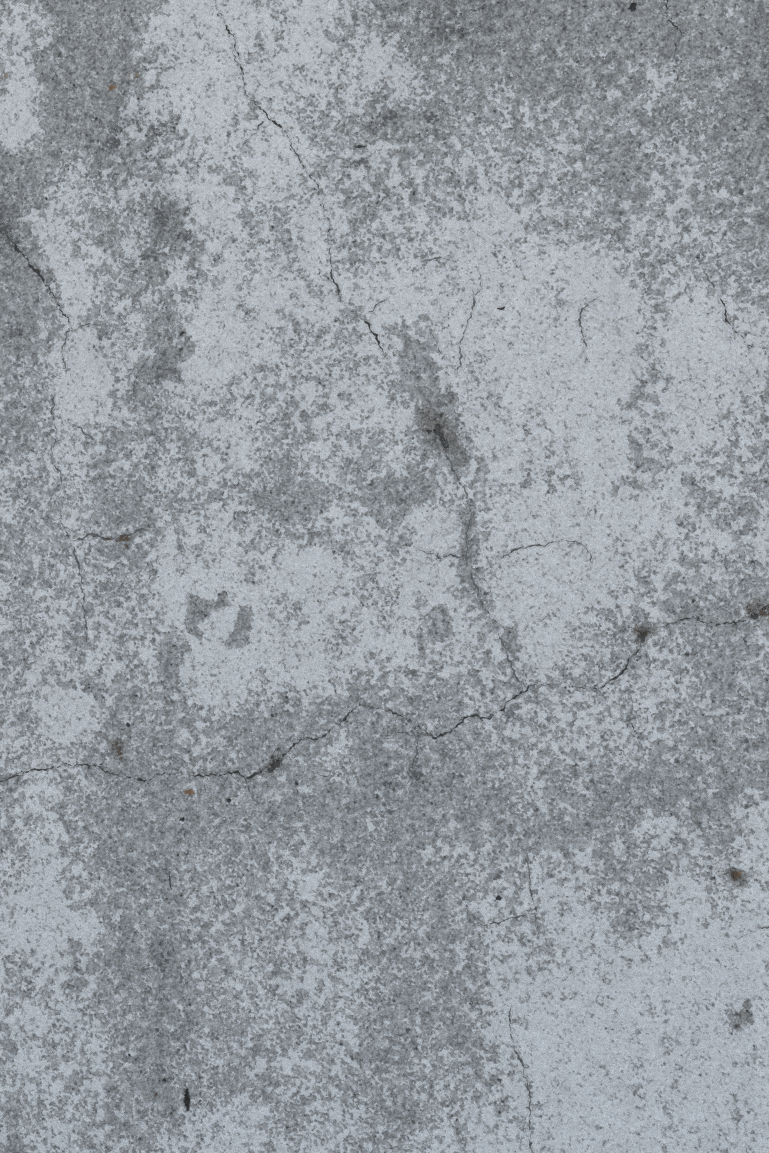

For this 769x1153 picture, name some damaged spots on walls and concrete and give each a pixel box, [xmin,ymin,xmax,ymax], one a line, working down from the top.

crack [0,231,151,647]
crack [214,0,390,358]
crack [422,255,453,263]
crack [431,270,482,408]
crack [0,453,769,795]
crack [506,1003,535,1153]